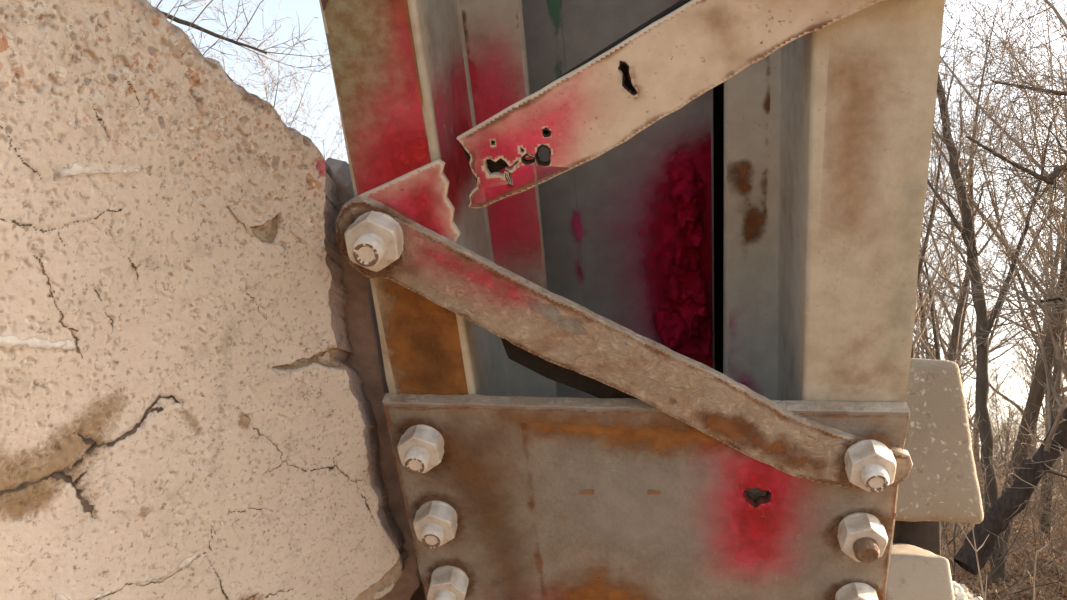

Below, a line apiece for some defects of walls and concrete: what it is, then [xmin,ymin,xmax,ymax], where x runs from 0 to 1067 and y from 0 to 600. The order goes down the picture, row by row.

corrosion [389,0,423,105]
corrosion [730,161,751,194]
corrosion [743,207,766,243]
crack [0,209,122,358]
corrosion [489,268,589,320]
corrosion [714,377,806,419]
water stain [0,392,119,520]
crack [0,395,180,519]
crack [242,412,376,523]
corrosion [514,404,909,488]
crack [95,508,293,600]